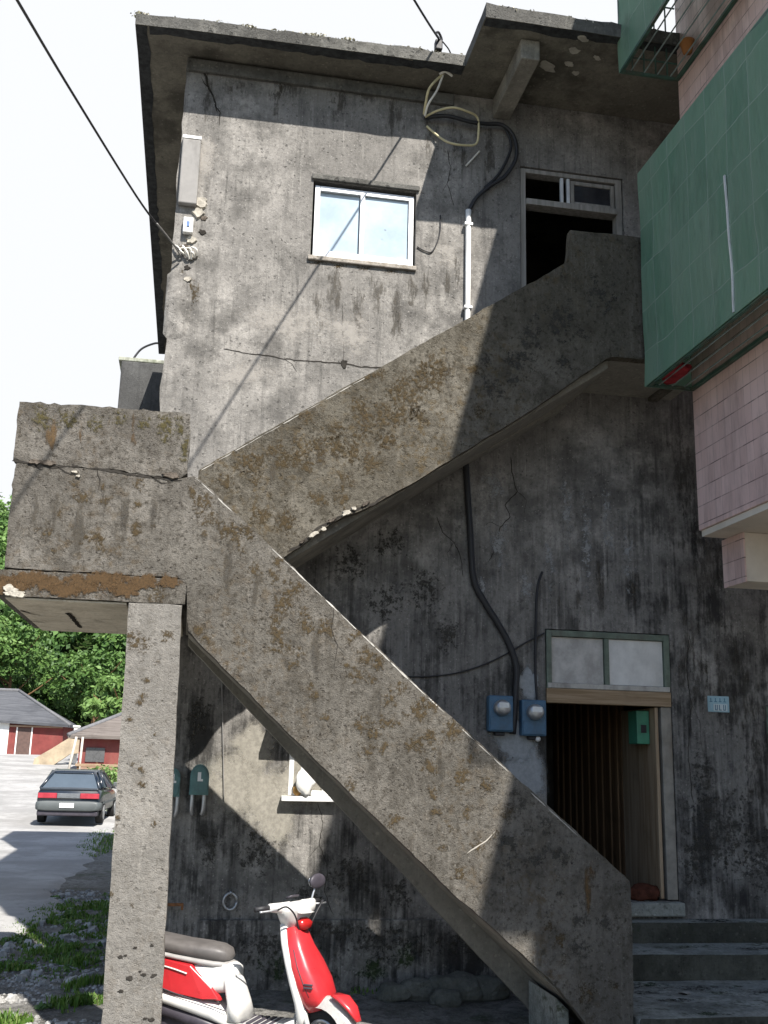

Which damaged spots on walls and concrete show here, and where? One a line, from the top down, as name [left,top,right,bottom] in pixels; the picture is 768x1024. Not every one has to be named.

spalling [540,35,589,76]
crack [202,73,221,125]
crack [12,459,181,489]
crack [487,459,526,562]
leakage [365,568,444,621]
leakage [682,739,768,900]